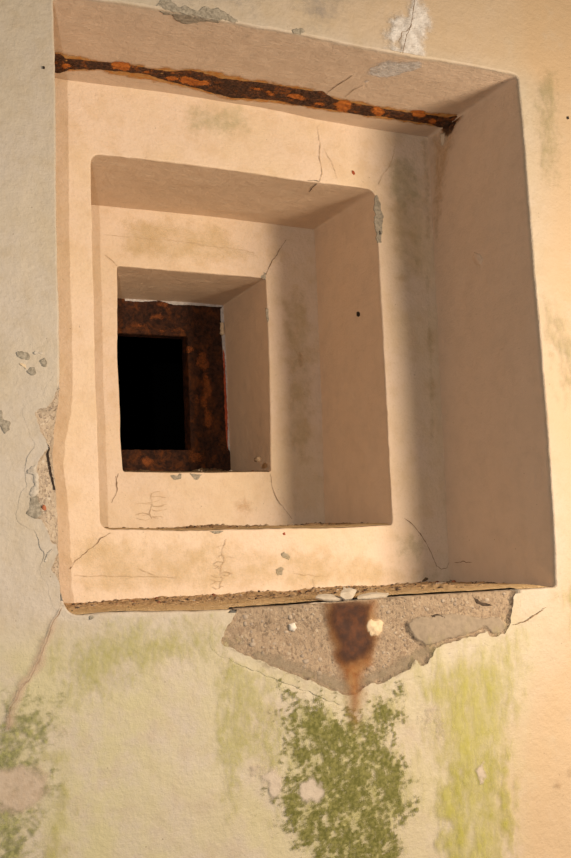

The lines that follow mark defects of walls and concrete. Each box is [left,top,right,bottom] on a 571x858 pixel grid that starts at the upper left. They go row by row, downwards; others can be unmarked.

flaking render [157,0,238,24]
water stain [367,0,431,82]
corrosion [43,52,461,146]
flaking render [373,195,384,243]
peeling [0,410,11,433]
corrosion [188,347,213,427]
spalling [16,351,63,612]
crack [407,520,472,569]
crack [8,608,62,729]
corrosion [329,602,376,708]
spalling [210,580,523,706]